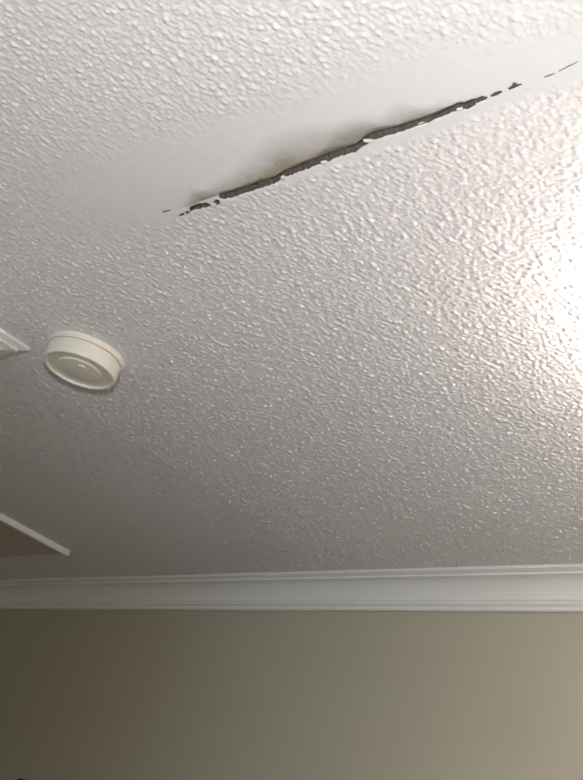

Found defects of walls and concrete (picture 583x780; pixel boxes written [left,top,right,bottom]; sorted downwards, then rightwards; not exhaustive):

crack [163,83,522,216]